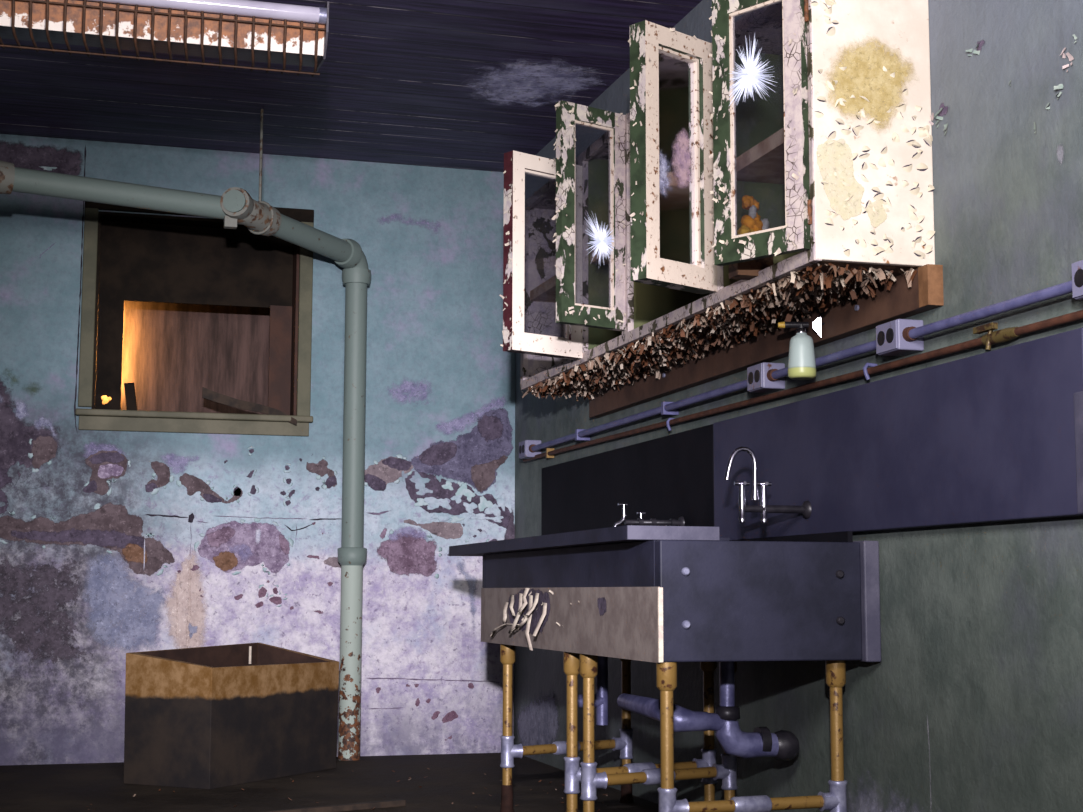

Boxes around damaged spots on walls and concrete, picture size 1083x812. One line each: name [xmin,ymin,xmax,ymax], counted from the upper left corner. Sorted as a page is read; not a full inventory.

damp [0,380,60,489]
damp [0,554,164,664]
peeling [145,454,259,504]
peeling [194,517,294,610]
peeling [280,454,337,506]
peeling [307,555,341,568]
spalling [364,454,515,579]